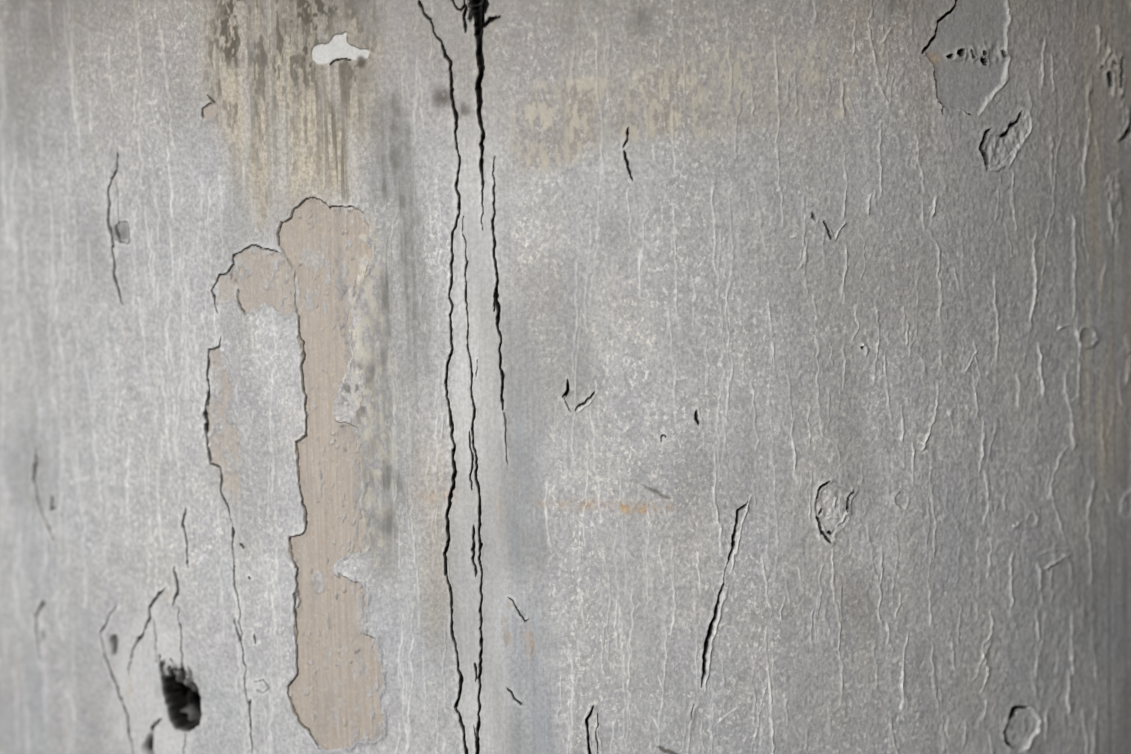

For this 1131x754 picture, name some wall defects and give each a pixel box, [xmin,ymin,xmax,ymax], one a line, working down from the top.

peeling [200,90,219,121]
peeling [307,27,373,67]
peeling [921,0,1034,172]
crack [106,148,124,305]
peeling [202,345,243,508]
peeling [210,194,386,752]
crack [416,0,523,754]
crack [685,492,754,754]
crack [585,704,600,754]
peeling [1002,702,1043,754]